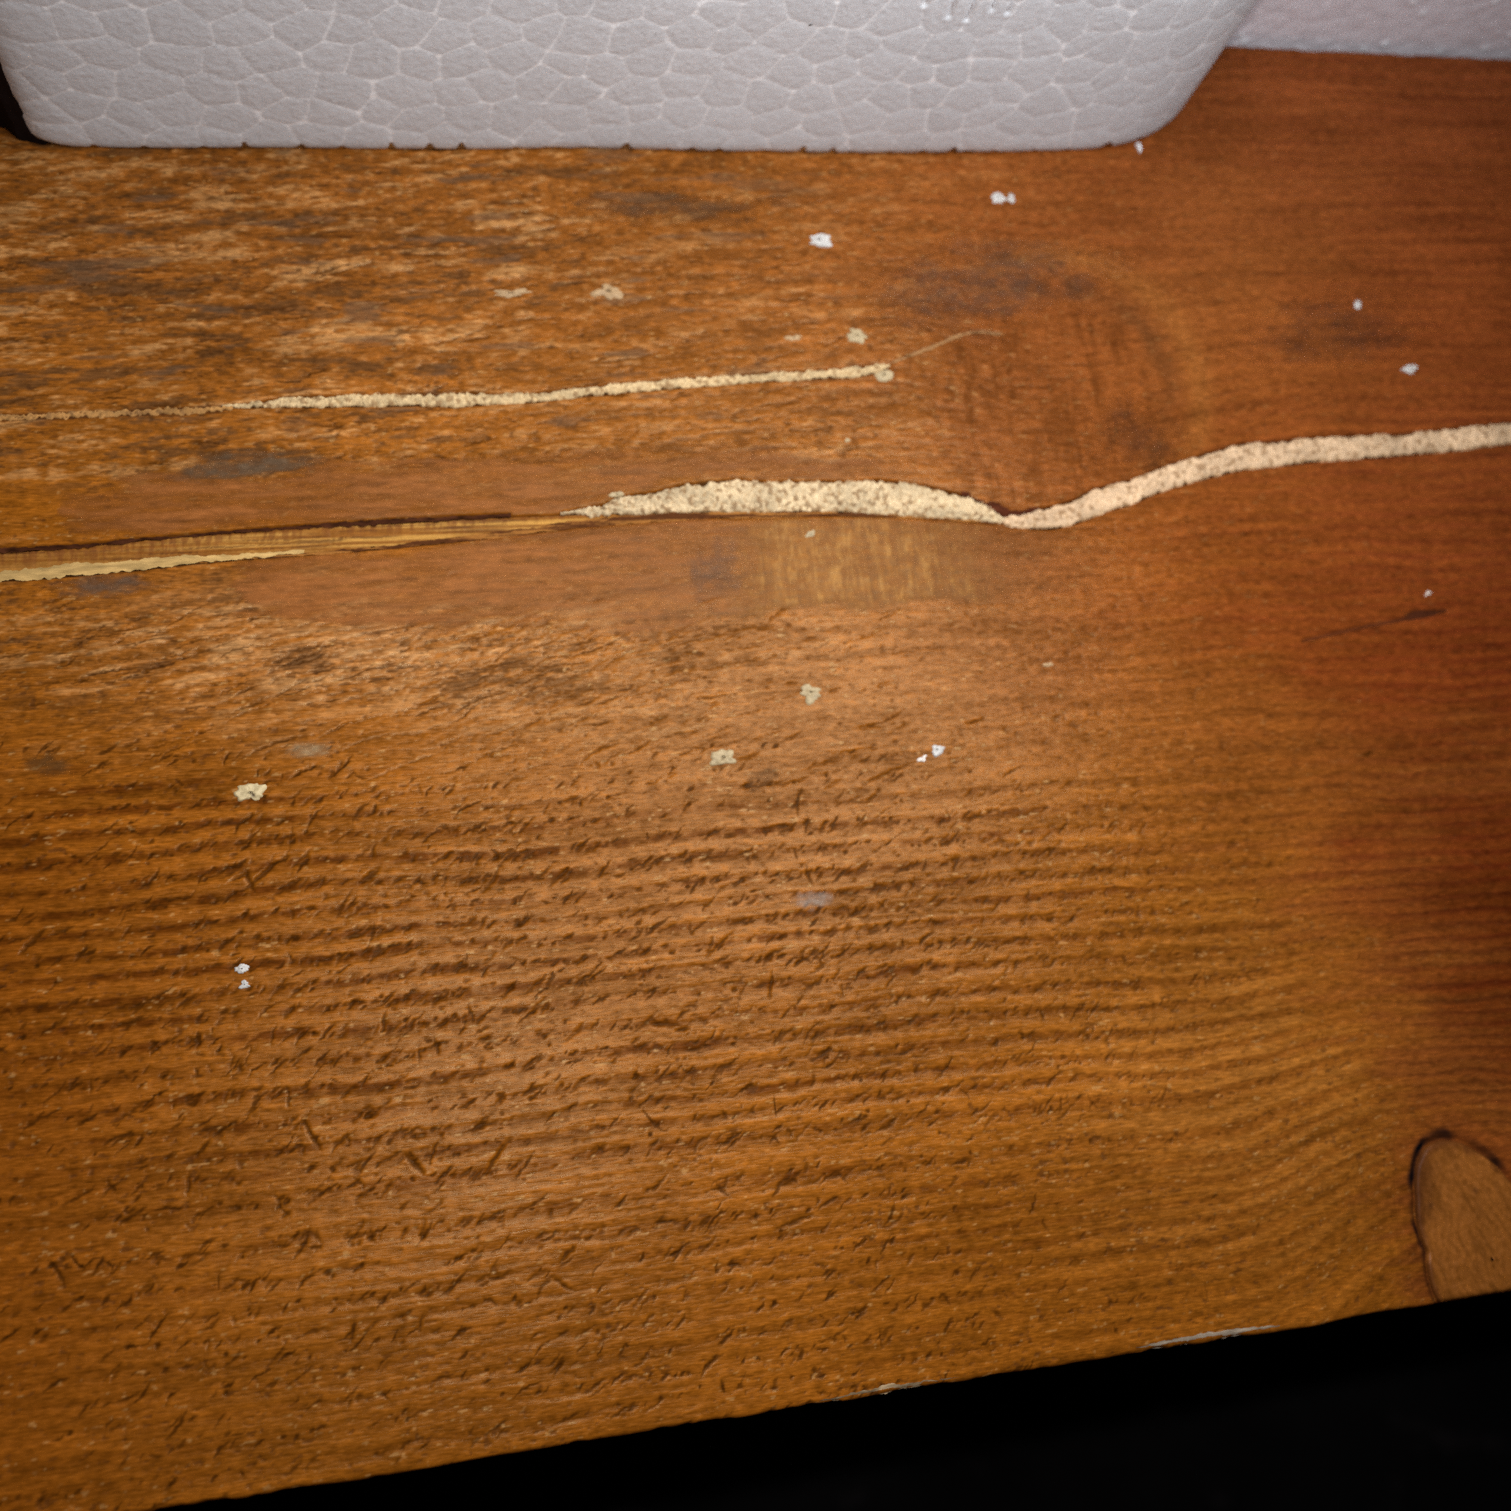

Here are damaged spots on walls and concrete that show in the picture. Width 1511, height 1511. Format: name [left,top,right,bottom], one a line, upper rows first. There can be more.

crack [0,330,1001,421]
crack [0,423,1511,582]
crack [1302,610,1447,641]